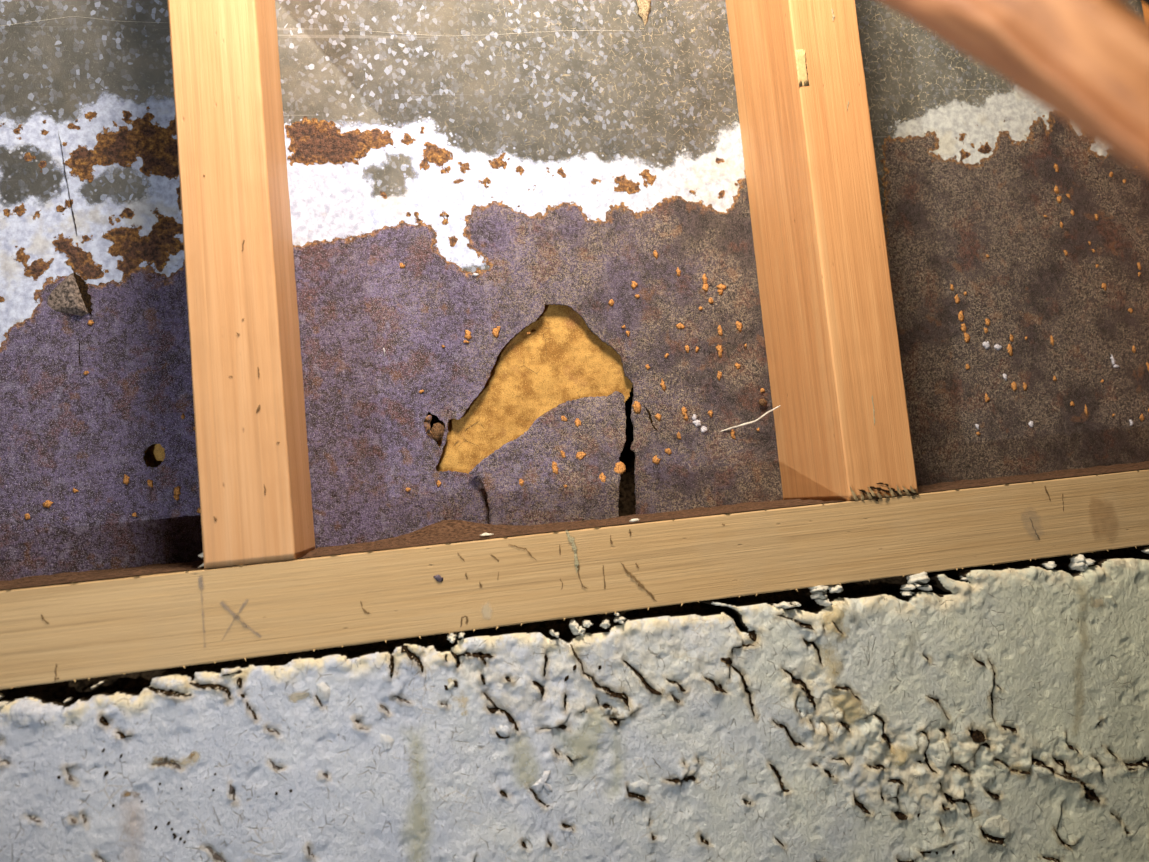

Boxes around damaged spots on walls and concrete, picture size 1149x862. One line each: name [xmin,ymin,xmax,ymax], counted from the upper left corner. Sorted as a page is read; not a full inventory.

corrosion [879,86,1149,486]
corrosion [0,88,204,581]
crack [151,761,181,769]
crack [148,670,280,735]
crack [380,645,494,713]
crack [484,693,519,731]
crack [529,615,1149,862]
crack [203,847,226,862]